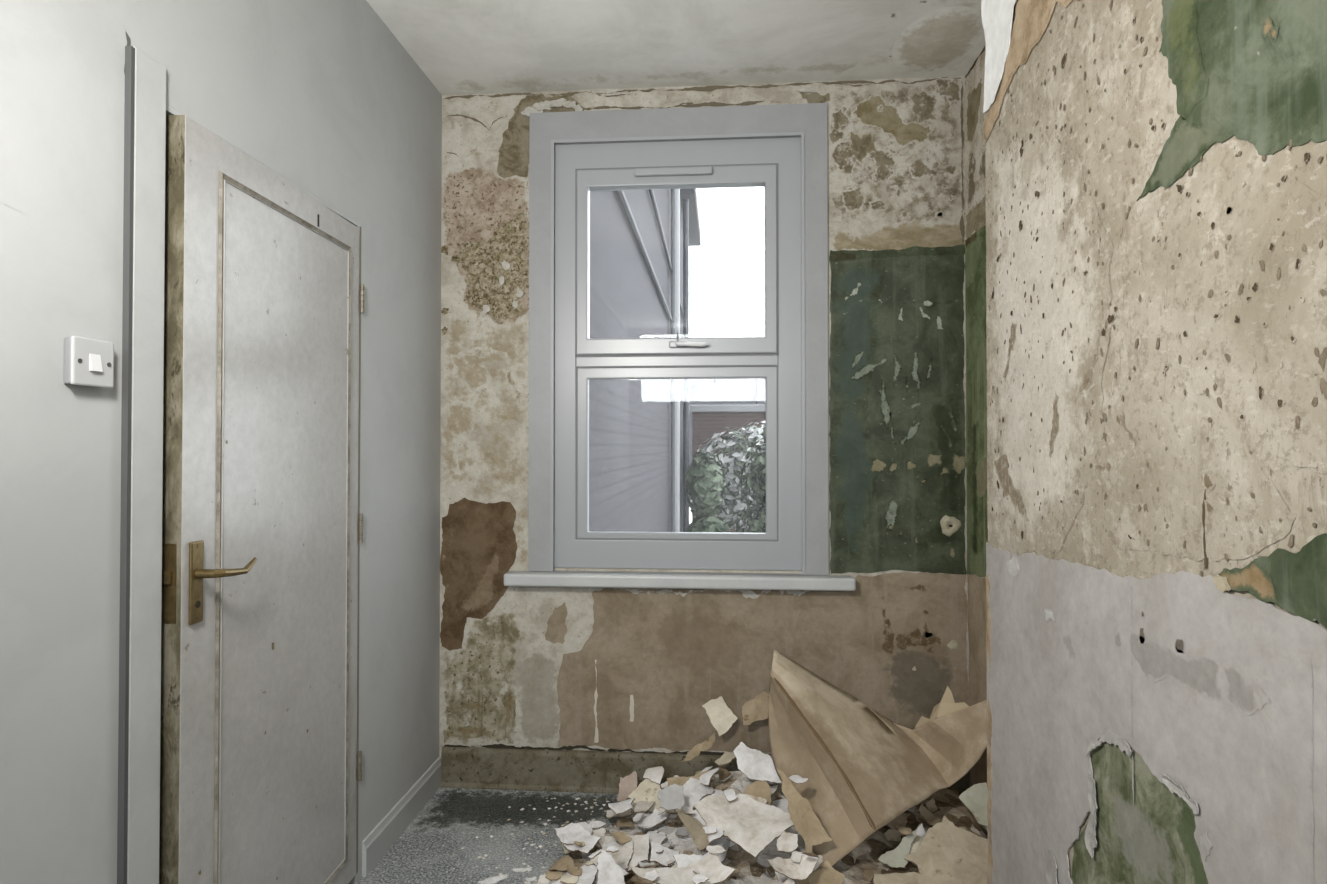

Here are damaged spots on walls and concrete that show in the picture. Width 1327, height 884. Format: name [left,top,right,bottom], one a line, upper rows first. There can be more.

spalling [1118,16,1157,75]
spalling [441,93,589,336]
peeling [797,52,1149,554]
spalling [1164,156,1232,266]
spalling [1207,218,1323,325]
spalling [1162,330,1222,444]
spalling [1258,384,1285,408]
spalling [1311,347,1327,407]
peeling [440,498,529,651]
flaking render [545,572,993,884]
peeling [1071,730,1213,884]